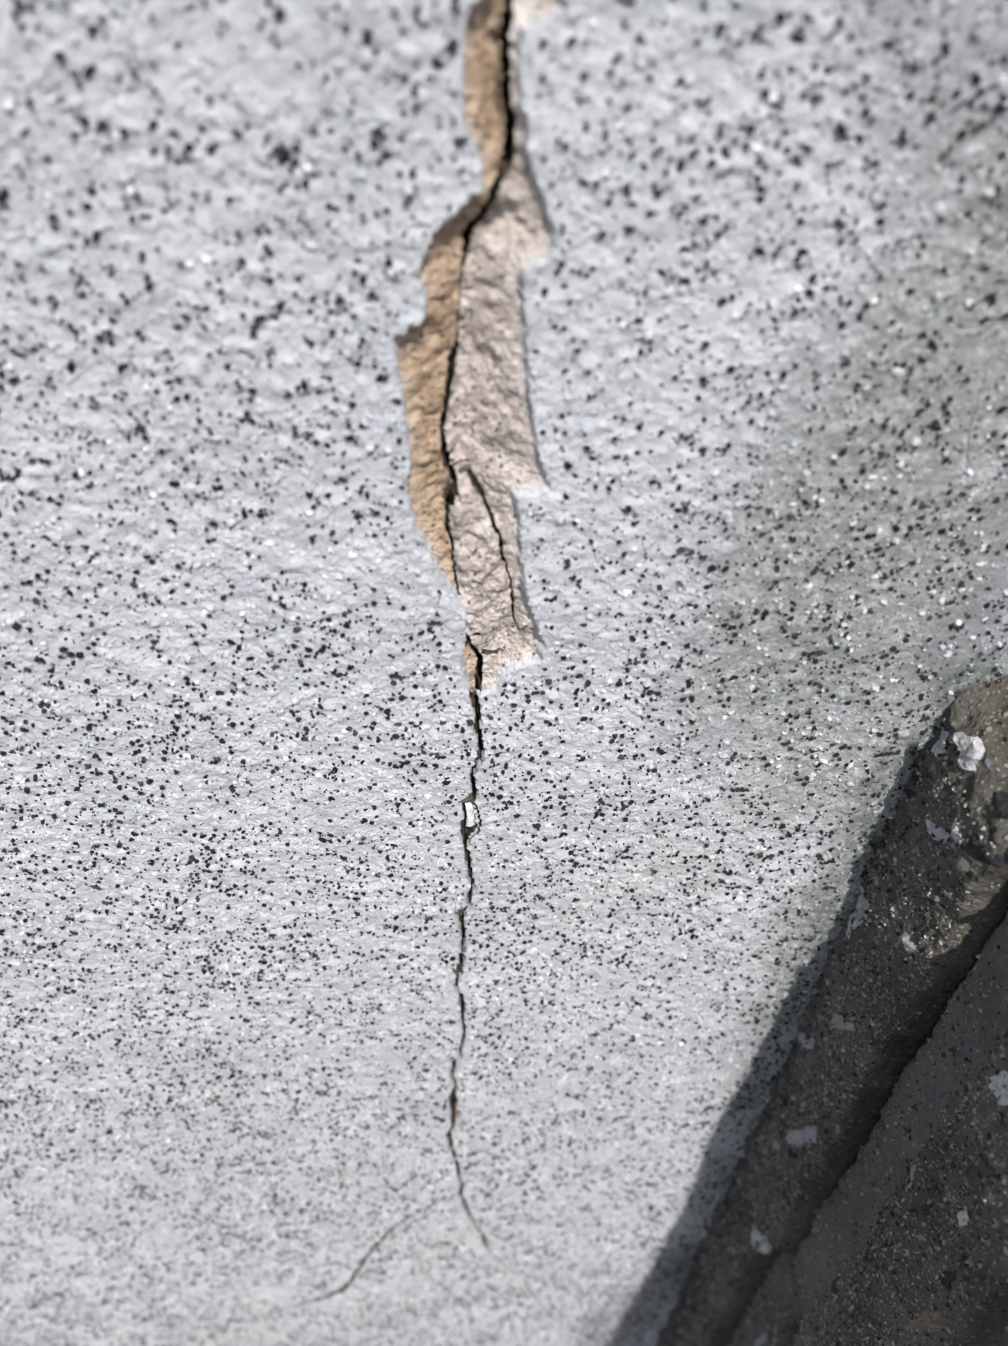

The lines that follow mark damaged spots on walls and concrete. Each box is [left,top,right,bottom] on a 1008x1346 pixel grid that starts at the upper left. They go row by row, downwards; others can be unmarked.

flaking render [395,0,563,713]
crack [232,667,534,1324]